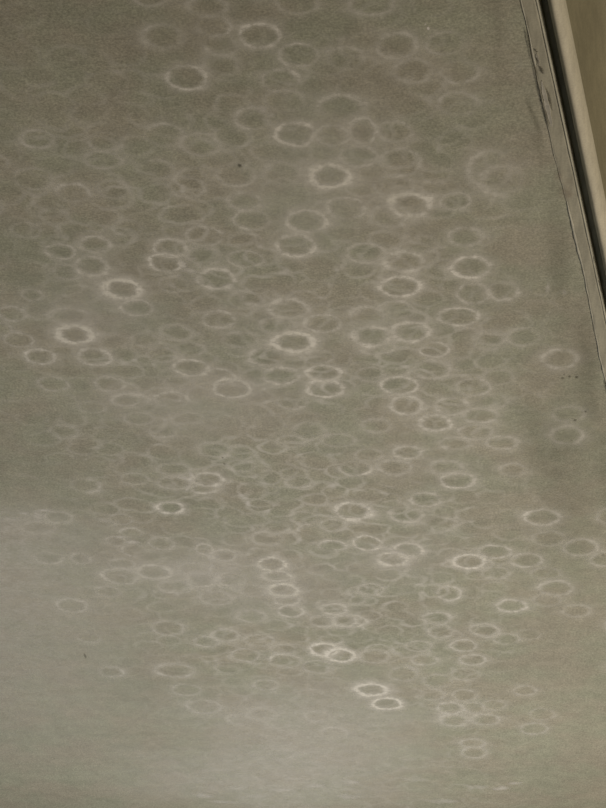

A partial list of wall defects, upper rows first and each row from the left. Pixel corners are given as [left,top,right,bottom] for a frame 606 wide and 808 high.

leakage [271,116,472,259]
leakage [44,235,153,316]
leakage [146,226,241,291]
leakage [51,322,113,366]
leakage [242,296,342,356]
leakage [247,349,346,399]
leakage [345,228,521,449]
leakage [255,545,370,628]
leakage [317,492,442,568]
leakage [450,544,544,579]
leakage [307,642,361,664]
leakage [351,681,404,710]